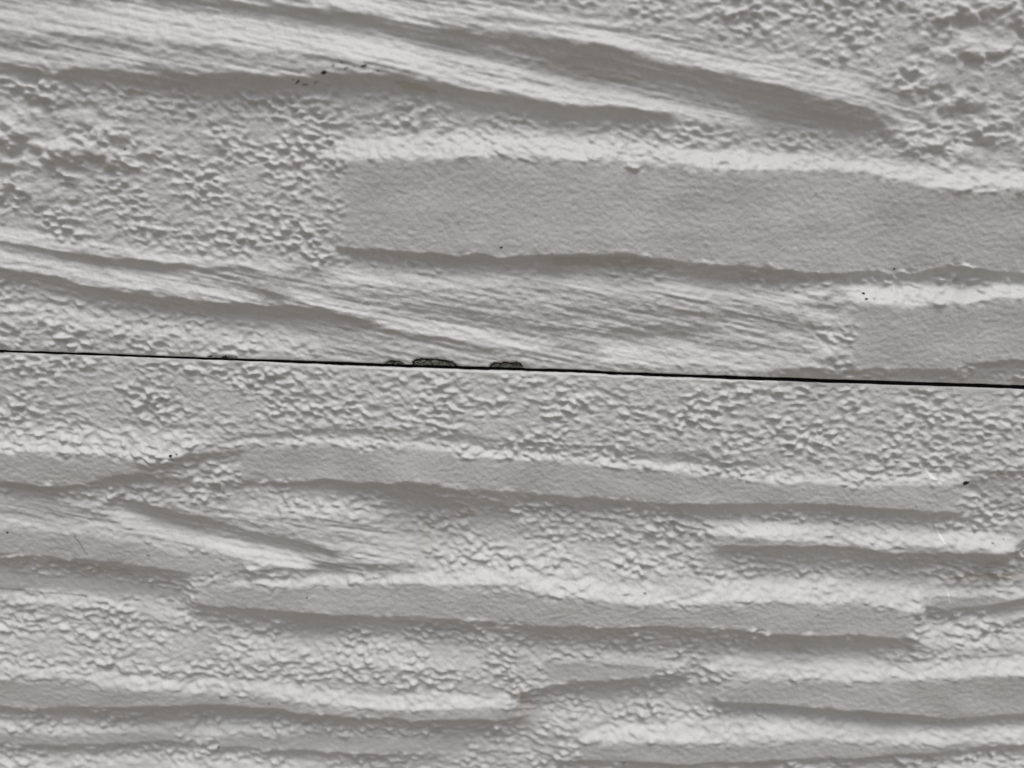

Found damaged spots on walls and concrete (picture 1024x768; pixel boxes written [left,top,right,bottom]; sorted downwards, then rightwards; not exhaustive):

spalling [385,358,457,366]